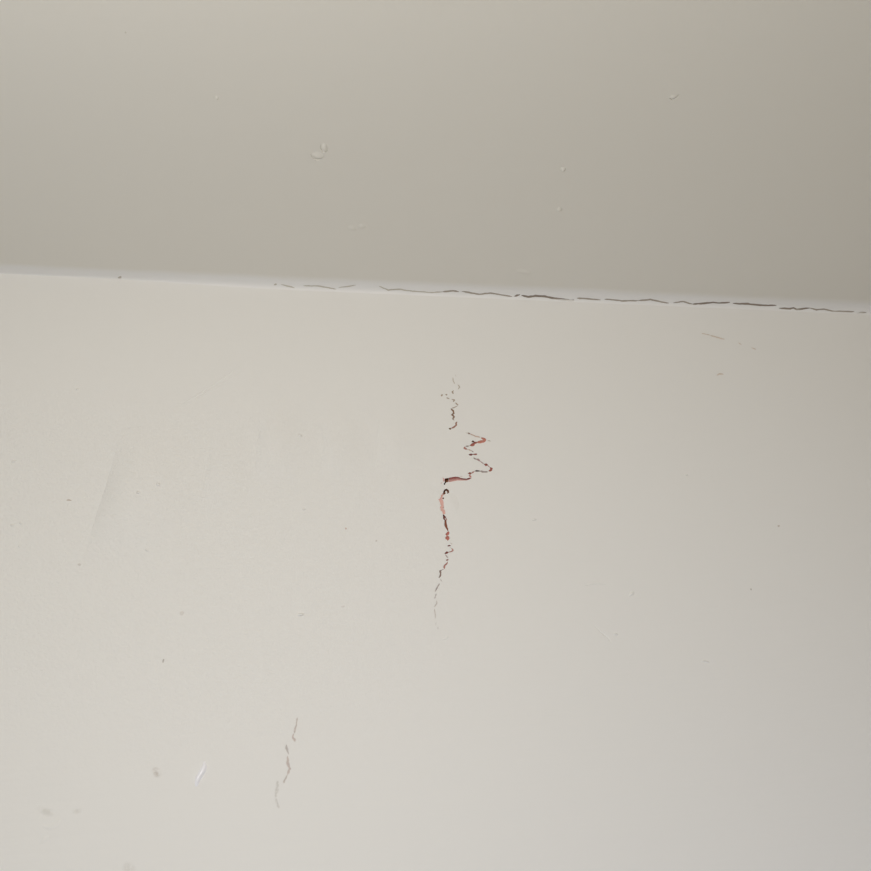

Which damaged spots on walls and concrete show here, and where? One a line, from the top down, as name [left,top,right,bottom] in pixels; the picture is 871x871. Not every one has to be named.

crack [274,282,355,290]
crack [379,286,866,313]
crack [434,380,493,629]